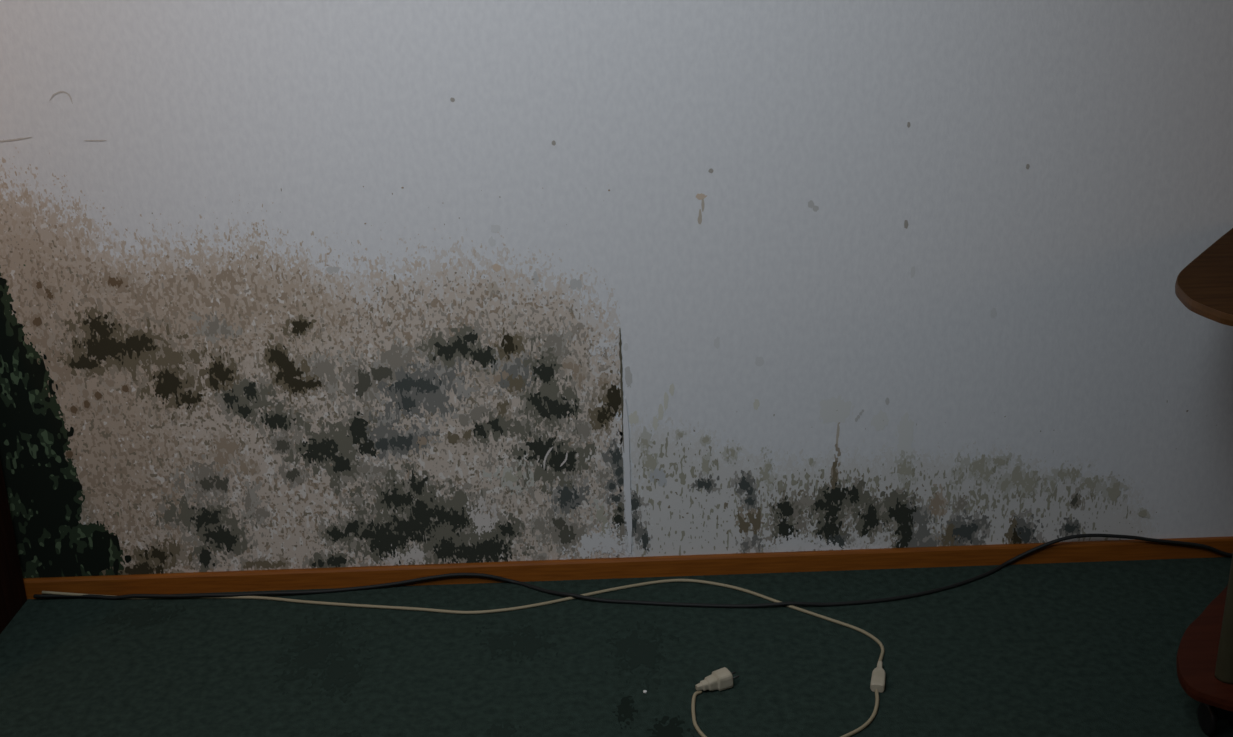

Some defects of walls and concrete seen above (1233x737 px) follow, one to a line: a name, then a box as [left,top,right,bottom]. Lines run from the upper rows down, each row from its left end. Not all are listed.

water stain [0,139,1179,578]